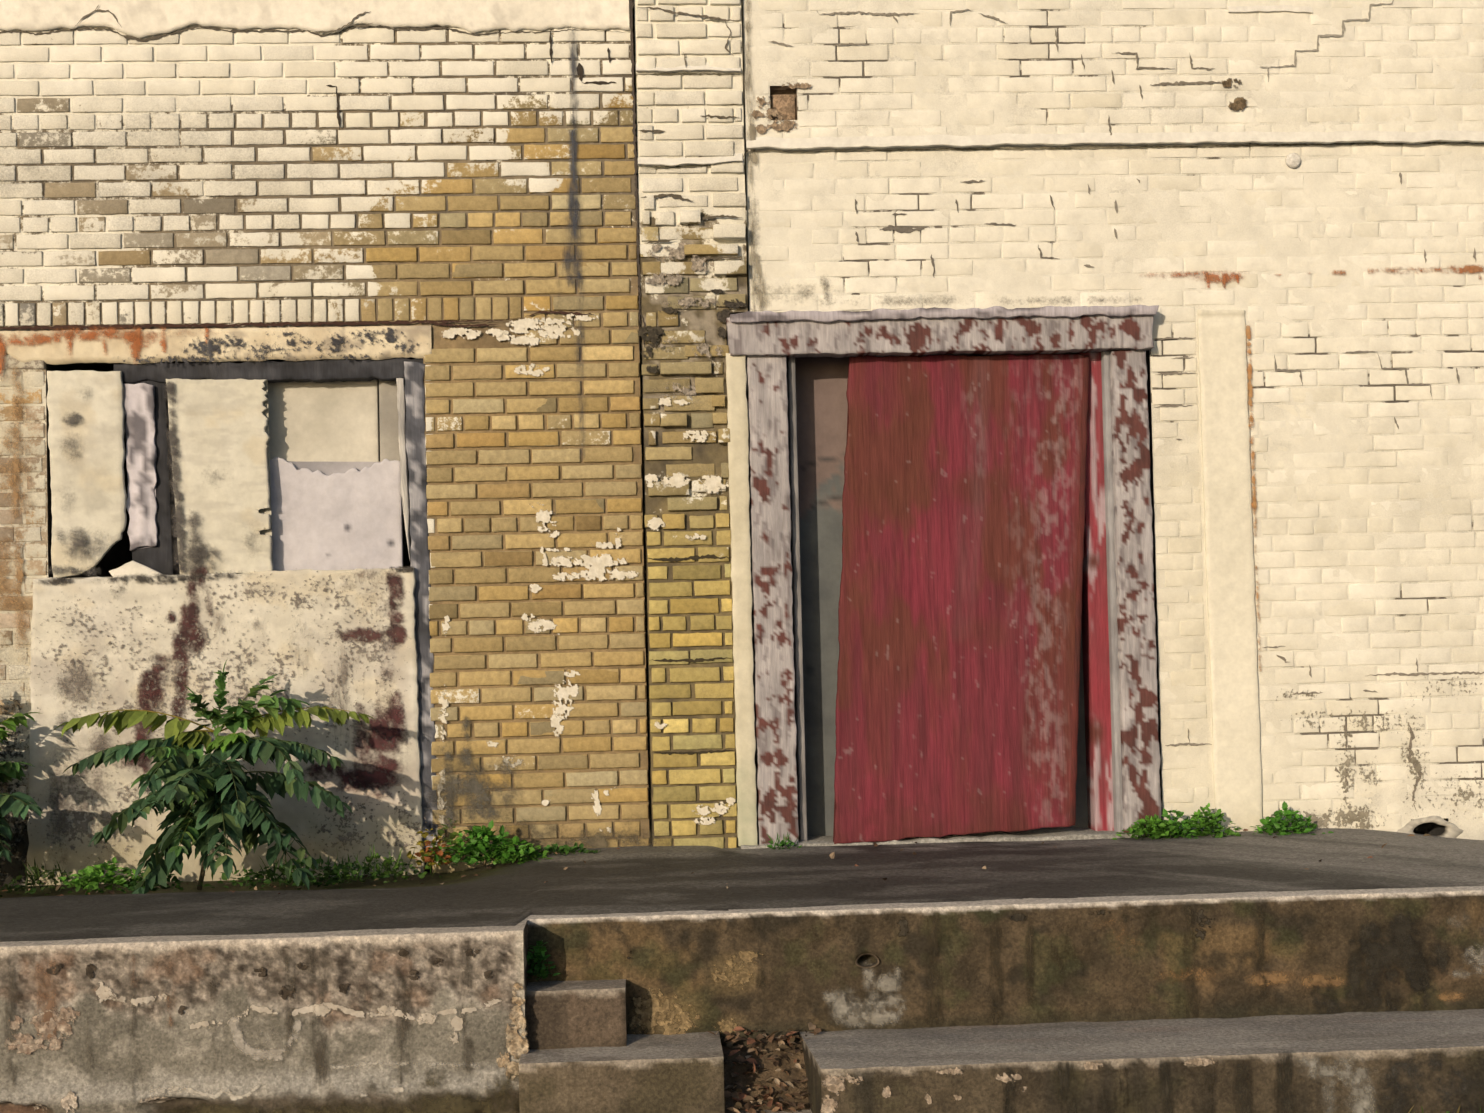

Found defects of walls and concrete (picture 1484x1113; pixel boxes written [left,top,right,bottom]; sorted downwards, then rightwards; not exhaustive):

crack [818,9,1008,46]
crack [0,0,791,352]
leakage [565,42,580,283]
crack [785,30,1478,277]
corrosion [1171,271,1241,288]
corrosion [1415,265,1483,279]
corrosion [0,328,166,517]
peeling [366,194,746,865]
leakage [1264,677,1484,829]
spalling [4,1006,80,1055]
flaking render [86,964,529,1081]
leakage [151,951,519,1113]